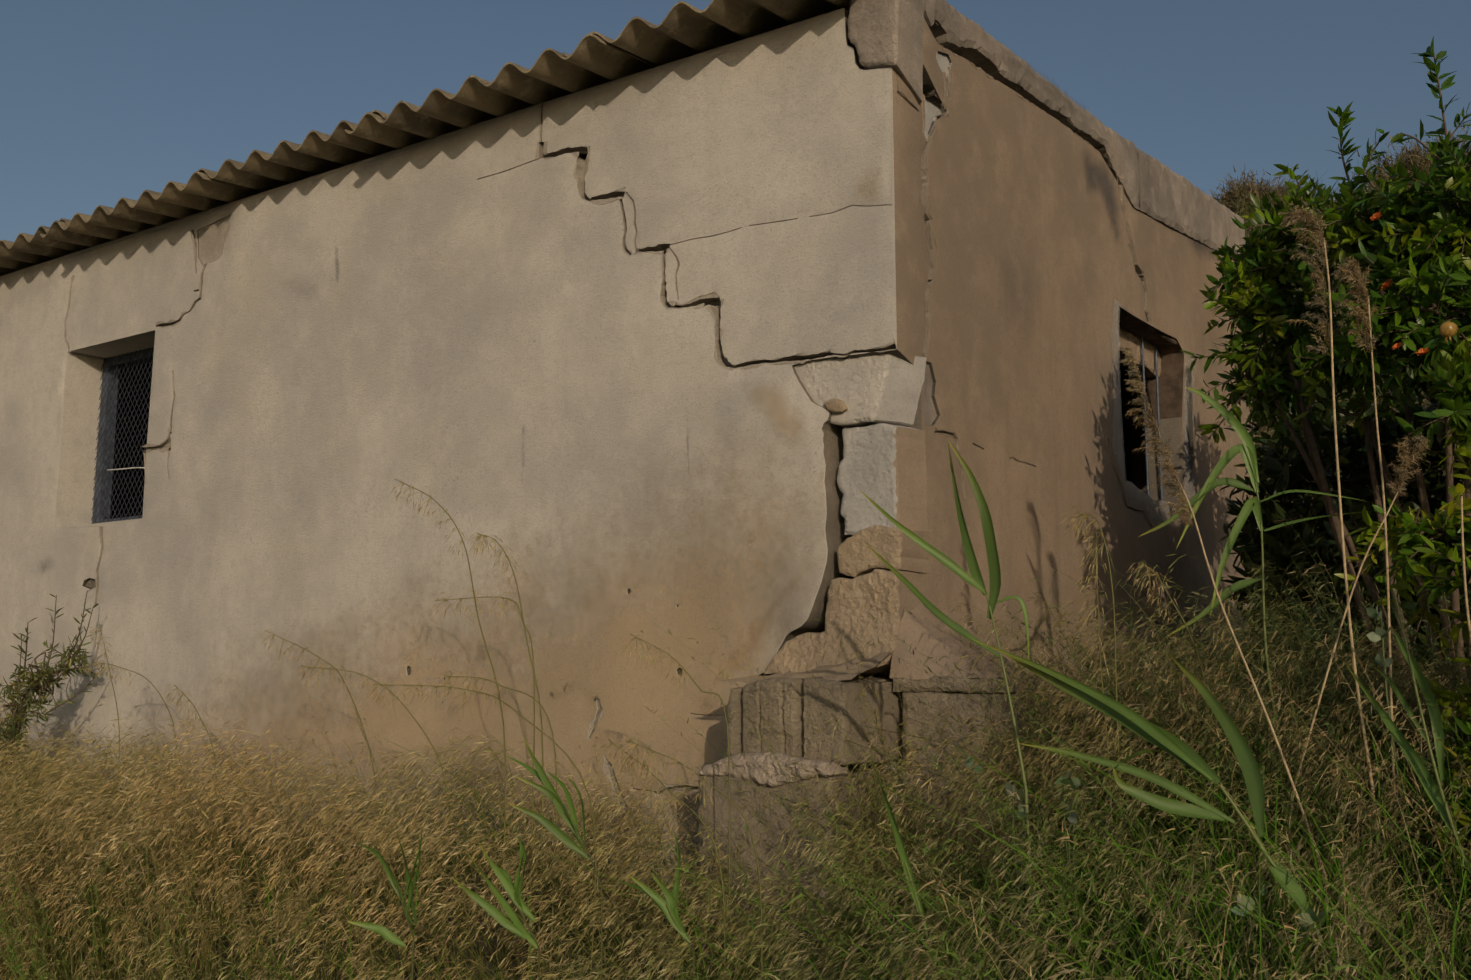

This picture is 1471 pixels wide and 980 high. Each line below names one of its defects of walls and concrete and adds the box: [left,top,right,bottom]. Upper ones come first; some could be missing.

crack [477,17,1151,370]
crack [64,275,75,353]
crack [156,231,206,328]
crack [142,370,175,484]
spalling [923,361,940,425]
crack [93,527,104,607]